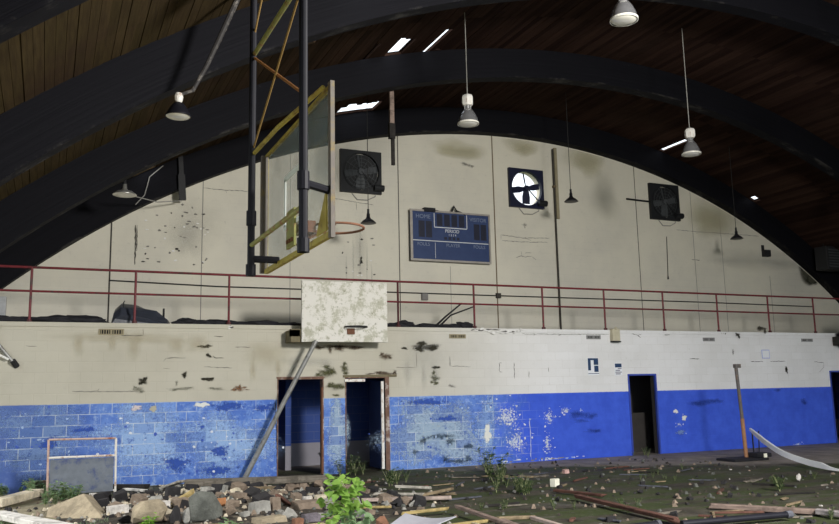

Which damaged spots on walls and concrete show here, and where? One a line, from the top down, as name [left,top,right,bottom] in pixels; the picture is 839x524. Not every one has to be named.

peeling [1,401,284,480]
peeling [377,395,584,465]